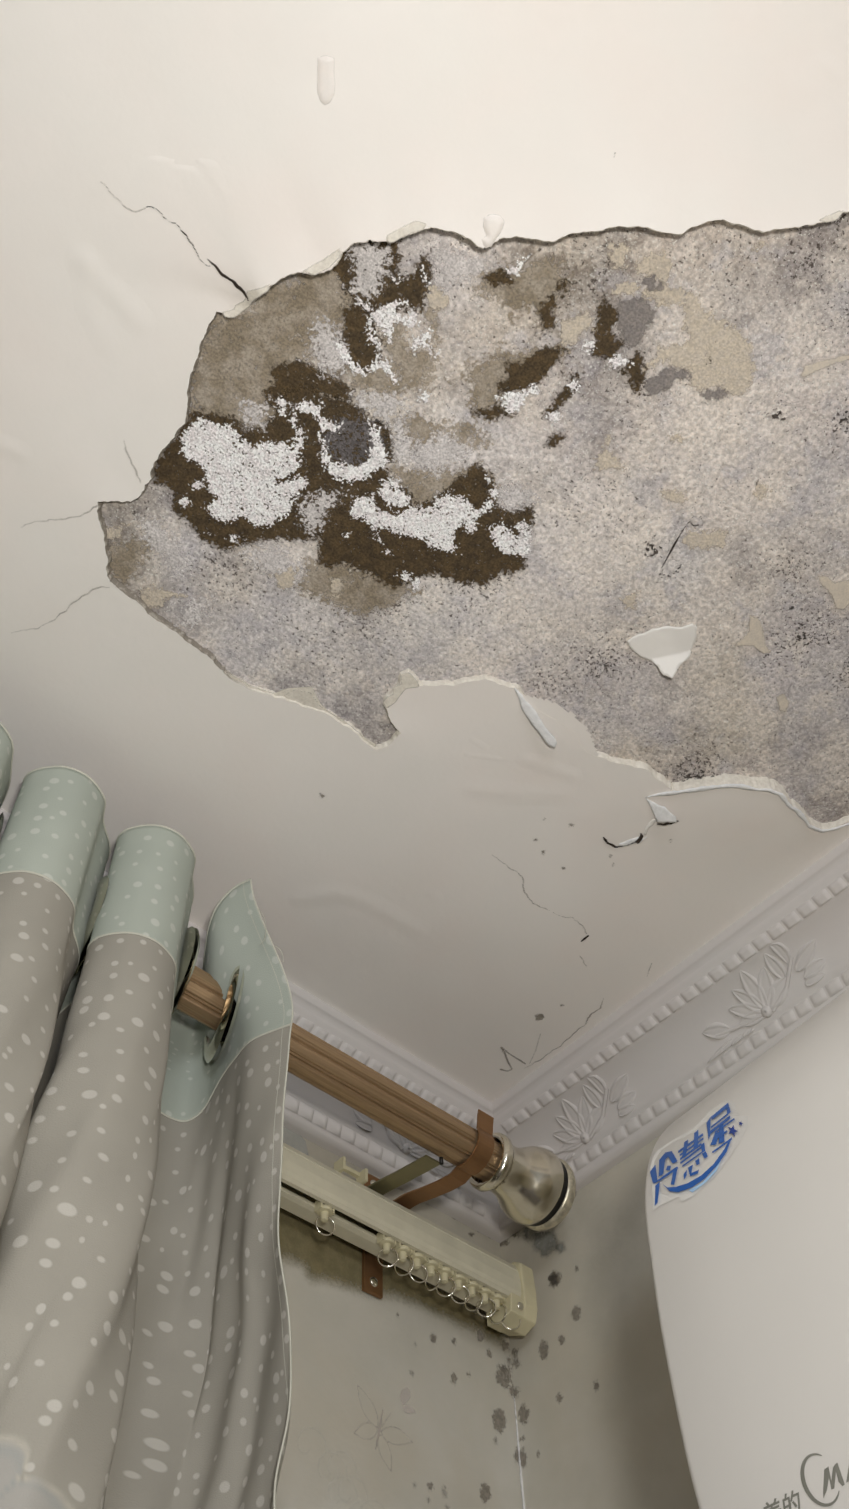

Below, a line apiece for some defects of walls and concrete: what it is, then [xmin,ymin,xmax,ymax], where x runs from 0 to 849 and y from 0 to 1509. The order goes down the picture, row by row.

crack [124,206,249,301]
leakage [109,234,648,631]
spalling [97,211,849,829]
leakage [539,1336,564,1360]
leakage [480,1484,491,1502]